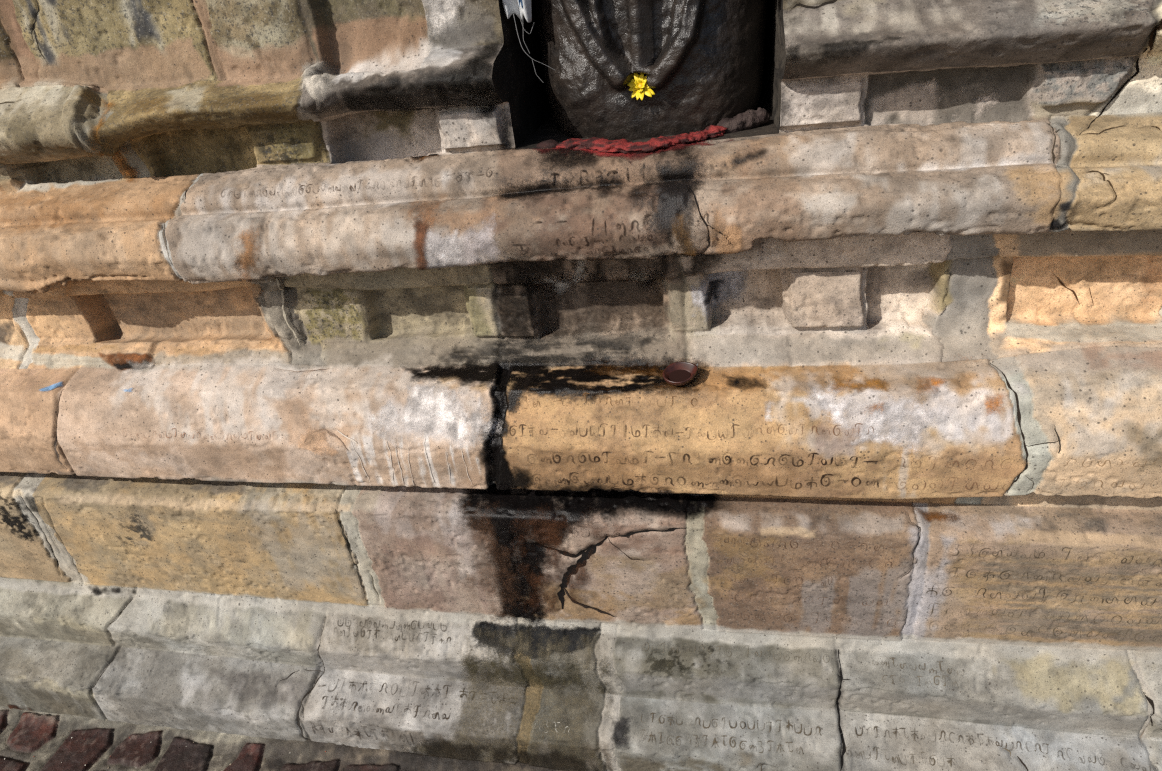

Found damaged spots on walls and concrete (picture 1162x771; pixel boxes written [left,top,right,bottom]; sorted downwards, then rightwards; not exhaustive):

leakage [467,35,503,120]
crack [1049,19,1162,167]
leakage [499,177,622,198]
leakage [581,141,711,235]
crack [1088,170,1117,208]
leakage [440,280,662,412]
leakage [479,439,490,465]
crack [990,363,1061,493]
leakage [0,497,38,541]
crack [547,528,686,617]
leakage [646,650,713,673]
crack [837,649,850,771]